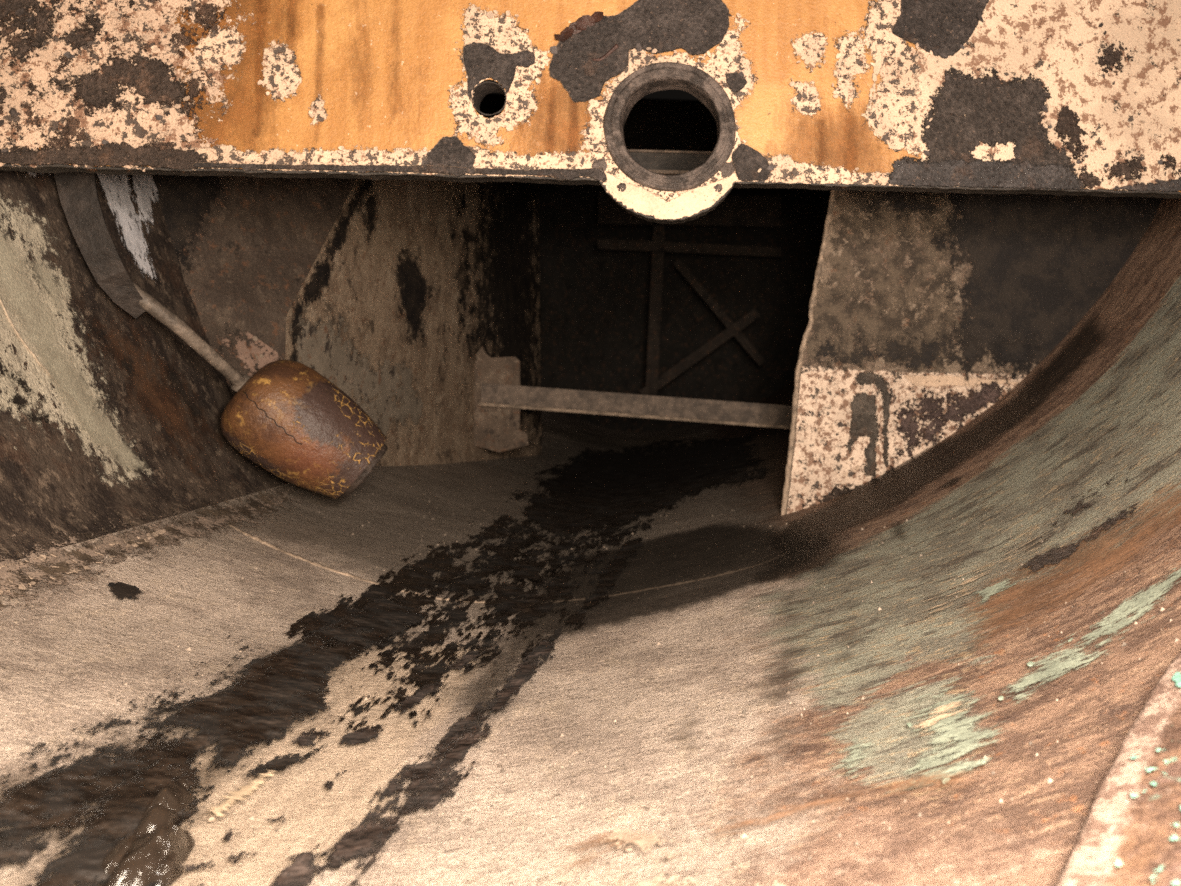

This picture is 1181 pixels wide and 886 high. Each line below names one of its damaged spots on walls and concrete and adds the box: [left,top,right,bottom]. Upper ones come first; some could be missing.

peeling [0,0,1181,436]
water stain [0,282,1103,886]
peeling [787,365,1027,514]